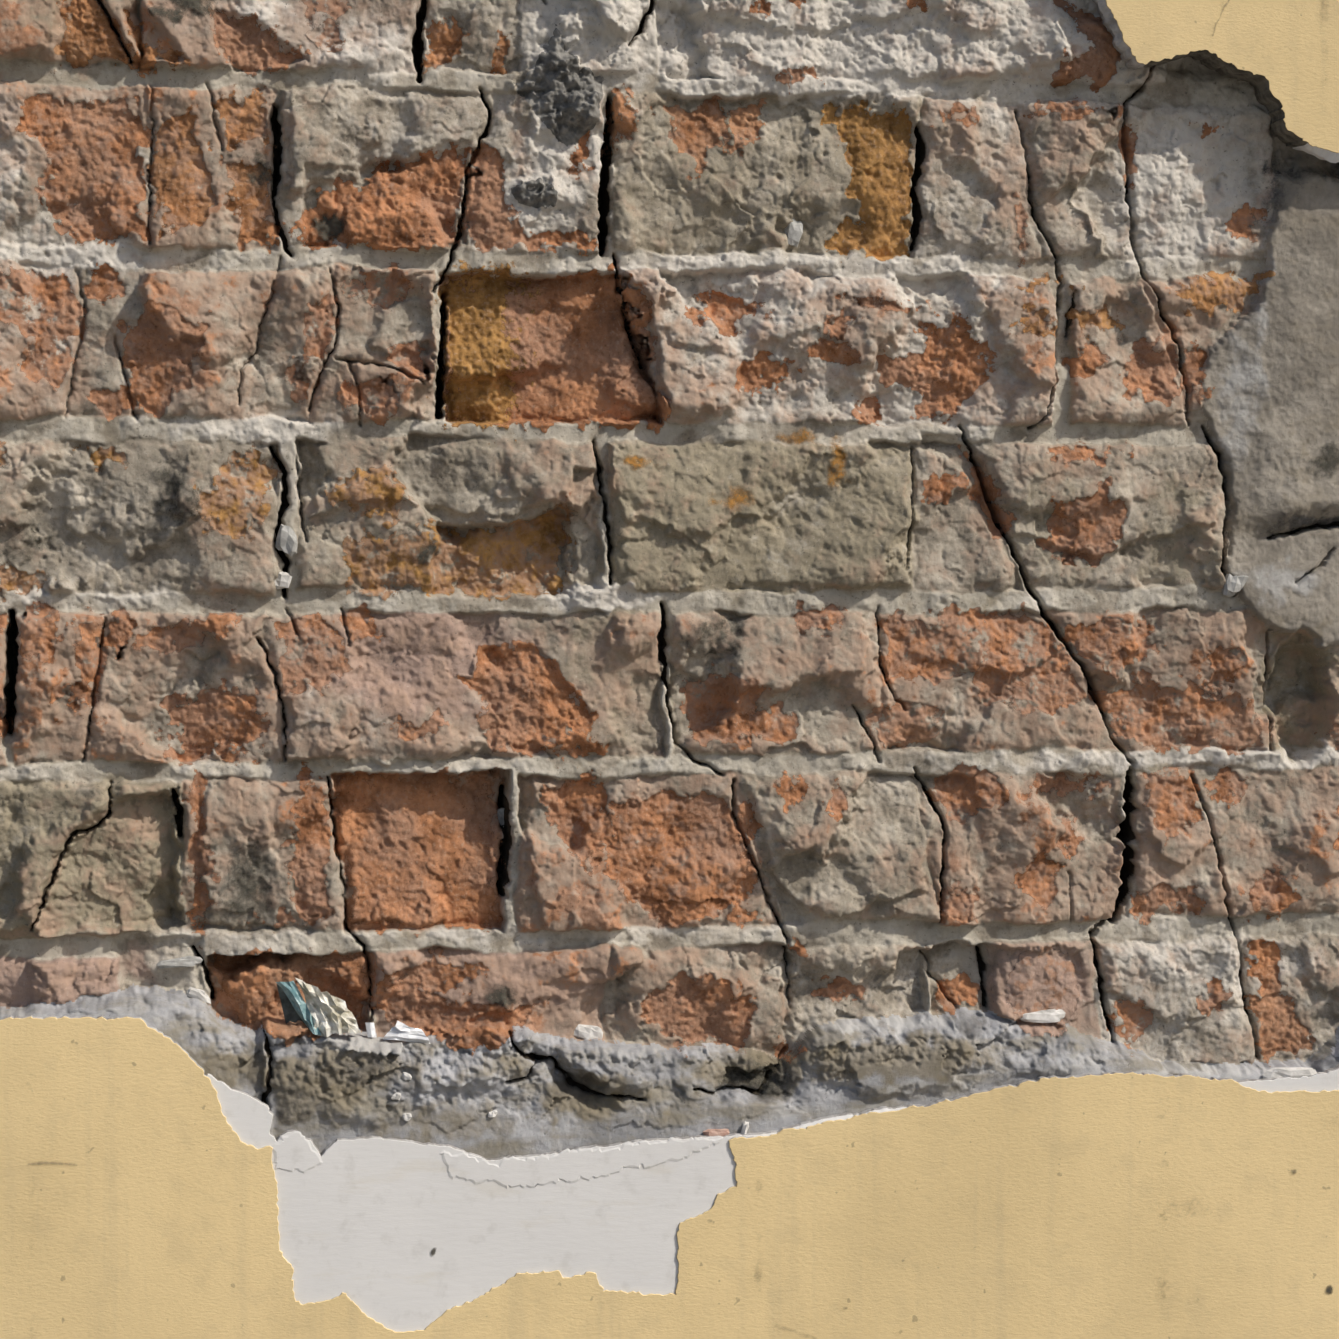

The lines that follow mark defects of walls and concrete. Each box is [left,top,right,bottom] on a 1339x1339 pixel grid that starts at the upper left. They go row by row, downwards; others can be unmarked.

spalling [0,0,672,444]
crack [434,91,491,287]
spalling [821,100,914,263]
spalling [1009,122,1339,649]
spalling [272,464,578,696]
crack [961,436,1130,763]
crack [32,787,111,928]
crack [327,777,372,1011]
crack [506,1035,643,1099]
spalling [0,640,1339,1332]
crack [657,603,787,965]
spalling [875,601,1264,846]